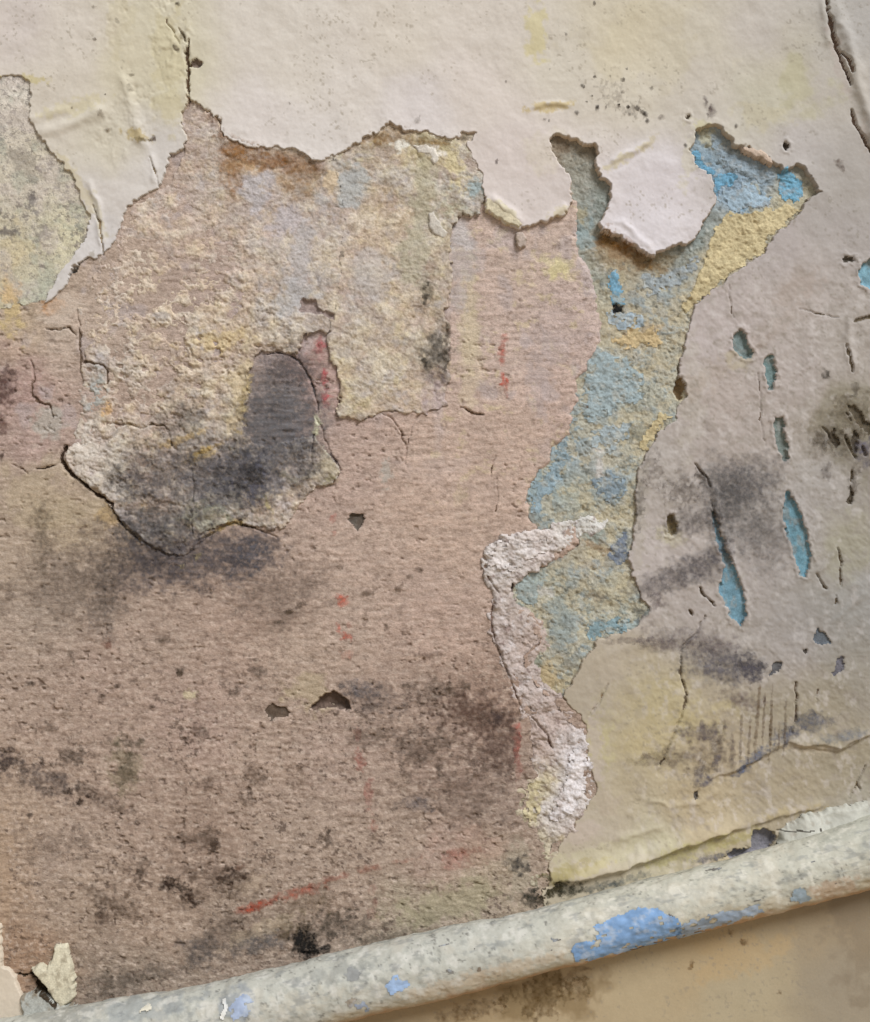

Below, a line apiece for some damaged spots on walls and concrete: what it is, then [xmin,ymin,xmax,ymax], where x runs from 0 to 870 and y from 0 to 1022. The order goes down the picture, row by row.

crack [825,0,854,85]
corrosion [220,135,298,176]
crack [850,110,870,153]
crack [47,326,109,384]
crack [30,377,52,409]
peeling [511,127,817,696]
leakage [105,354,325,591]
spalling [0,75,608,1005]
peeling [803,628,831,654]
crack [678,666,688,710]
leakage [429,686,519,779]
mould [247,902,368,960]